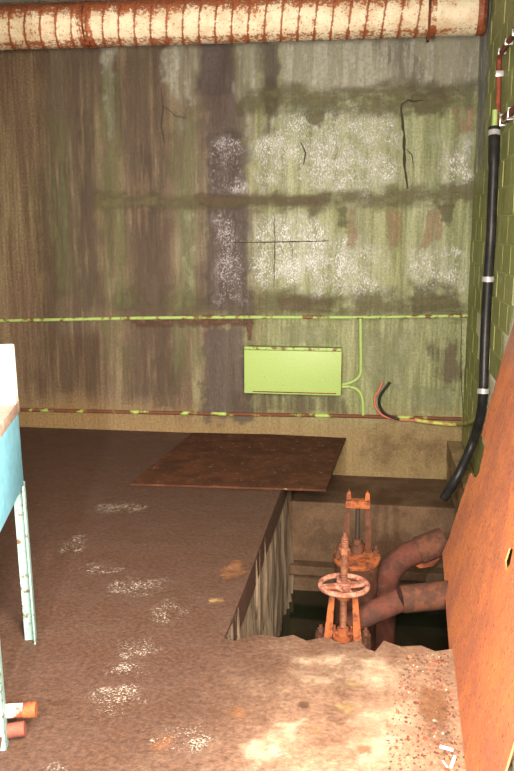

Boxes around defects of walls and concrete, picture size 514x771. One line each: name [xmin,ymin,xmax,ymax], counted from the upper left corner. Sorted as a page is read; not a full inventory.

damp [39,49,99,388]
damp [102,39,485,310]
crack [400,99,423,189]
damp [202,327,270,421]